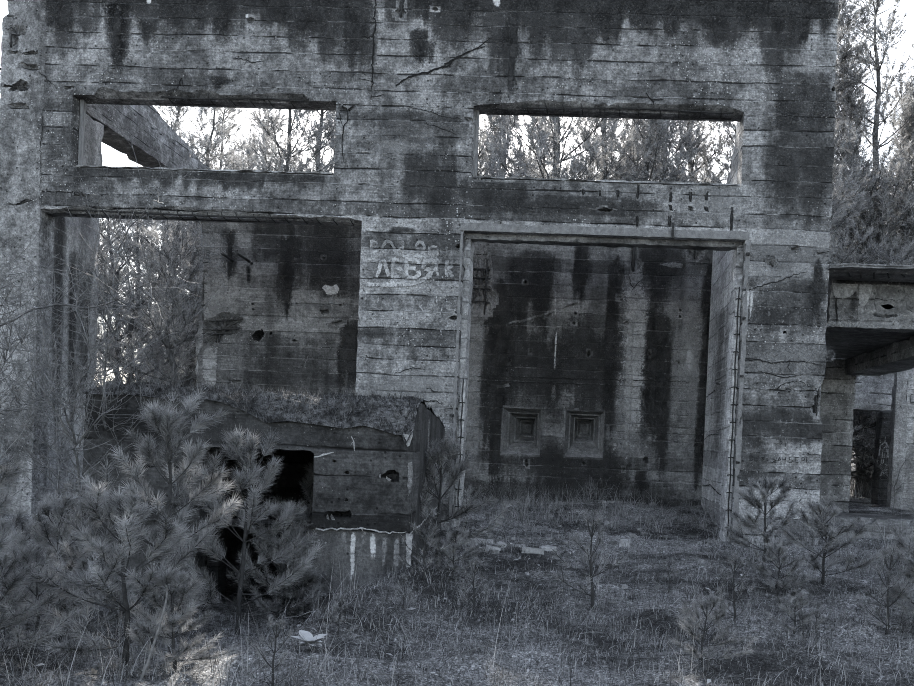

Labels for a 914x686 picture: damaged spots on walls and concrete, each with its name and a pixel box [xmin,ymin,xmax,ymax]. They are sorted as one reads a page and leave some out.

spalling [1,15,40,110]
crack [339,0,492,161]
water stain [42,0,838,223]
water stain [204,229,251,318]
water stain [252,223,361,312]
water stain [202,346,218,387]
water stain [243,317,359,393]
water stain [479,245,712,491]
water stain [370,534,399,567]